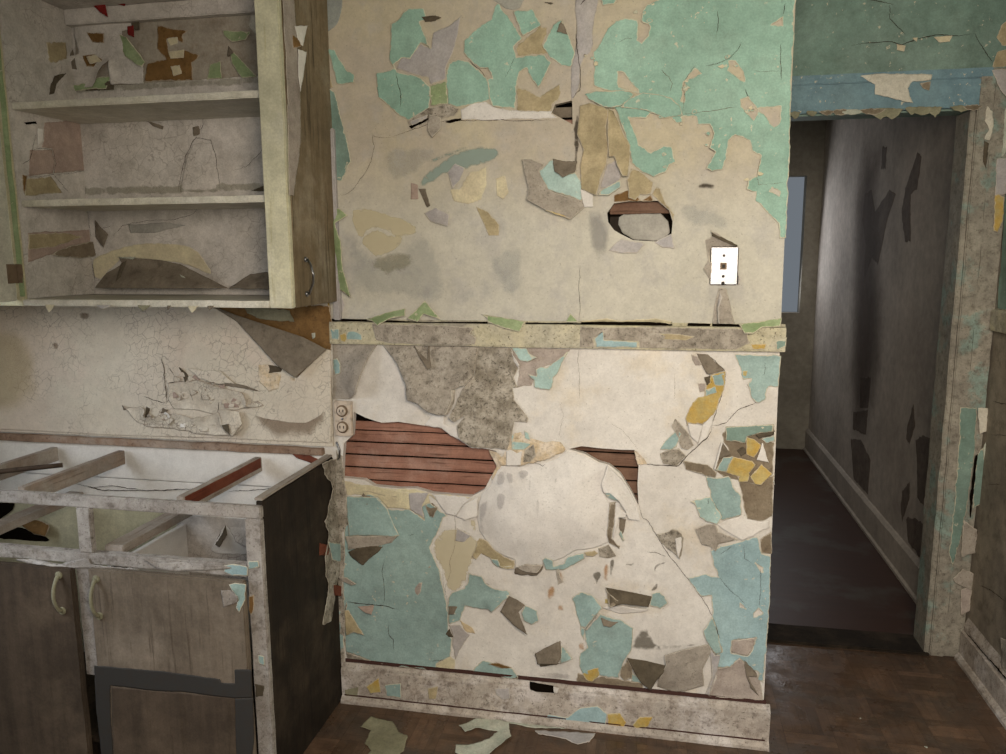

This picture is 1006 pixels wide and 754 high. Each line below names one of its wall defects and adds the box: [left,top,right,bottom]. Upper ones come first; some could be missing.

peeling [292,26,307,92]
peeling [376,0,1006,310]
crack [144,359,184,403]
peeling [122,364,295,436]
peeling [293,413,647,669]
flaking render [511,347,570,390]
peeling [657,354,775,683]
peeling [712,288,787,403]
peeling [851,378,871,495]
peeling [901,404,930,557]
peeling [949,407,988,615]
peeling [572,592,643,689]